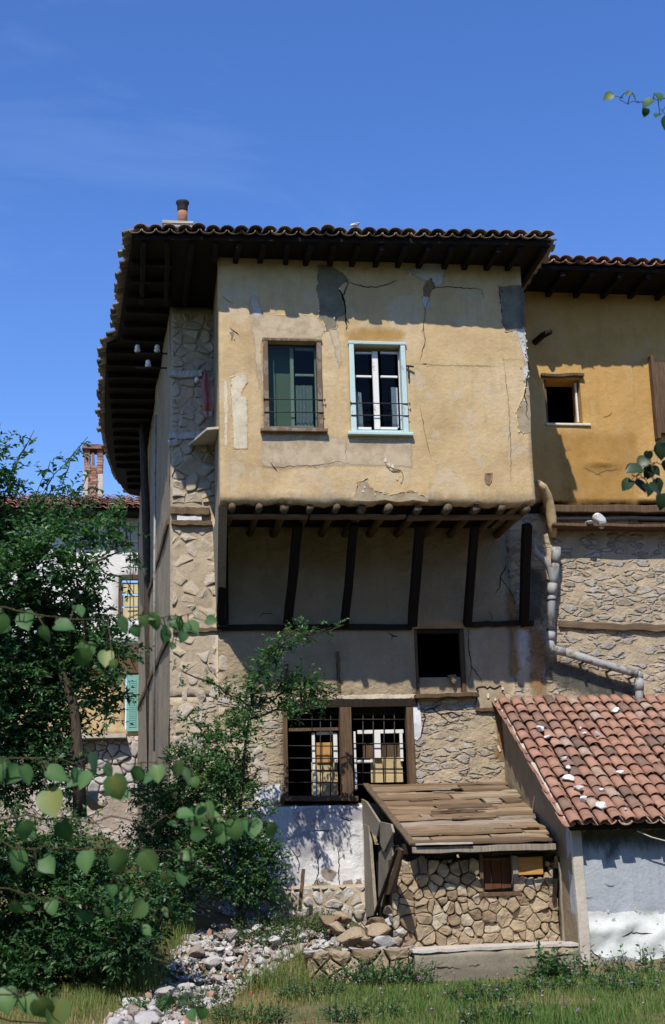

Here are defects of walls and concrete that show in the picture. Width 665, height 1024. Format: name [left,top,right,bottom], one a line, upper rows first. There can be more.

peeling [223,264,349,450]
crack [338,280,397,329]
peeling [405,263,445,309]
crack [415,286,512,476]
peeling [497,284,531,434]
peeling [261,433,429,502]